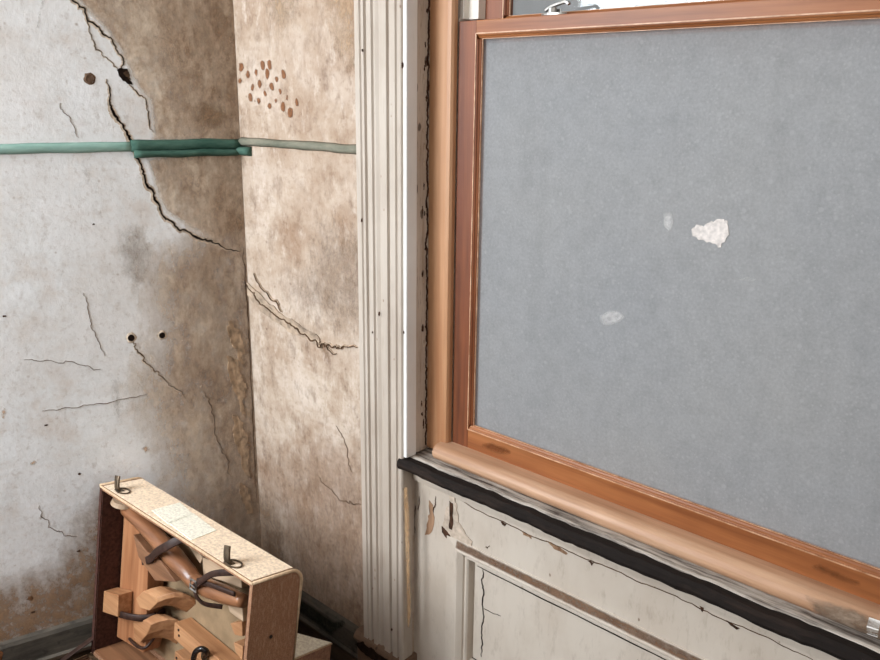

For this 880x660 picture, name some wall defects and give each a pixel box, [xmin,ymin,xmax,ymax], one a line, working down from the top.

rust [238,60,298,118]
crack [70,0,358,477]
crack [319,477,362,505]
damp [0,517,98,642]
peeling [425,496,701,660]